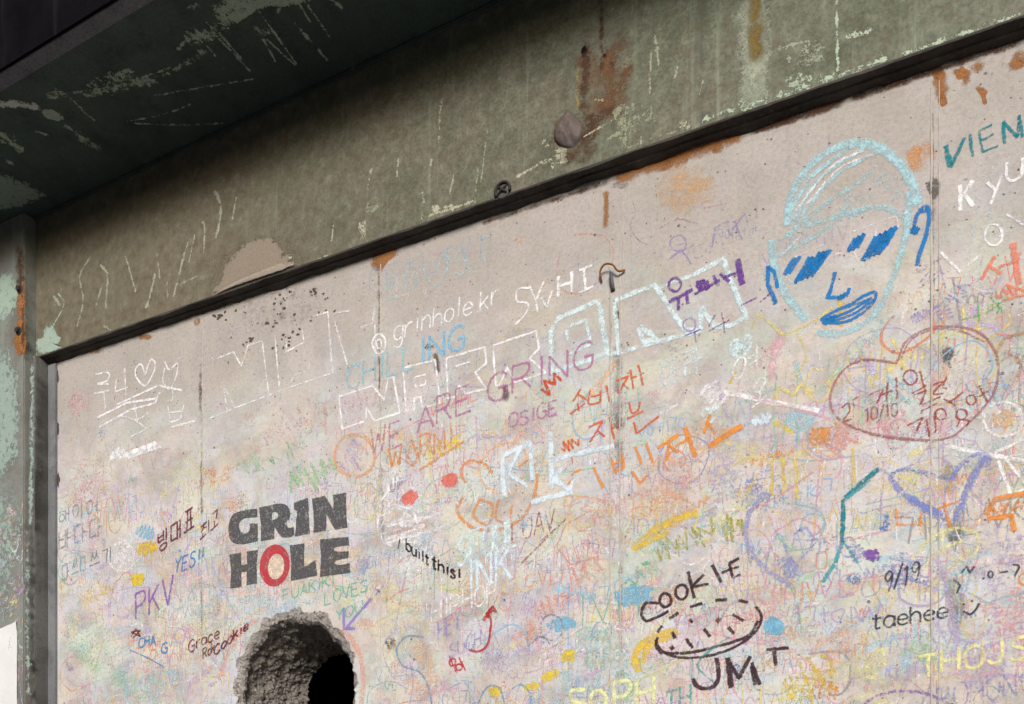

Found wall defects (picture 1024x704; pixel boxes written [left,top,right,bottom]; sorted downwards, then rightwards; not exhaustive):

corrosion [575,1,630,140]
corrosion [753,41,1024,134]
corrosion [484,136,740,226]
corrosion [13,248,28,356]